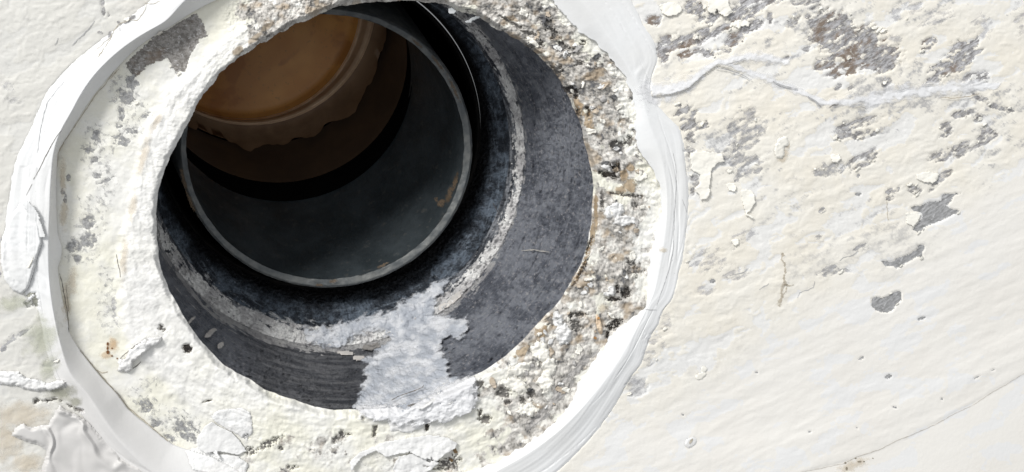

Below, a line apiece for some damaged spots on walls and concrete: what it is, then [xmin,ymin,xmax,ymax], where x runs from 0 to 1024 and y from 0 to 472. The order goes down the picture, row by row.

peeling [645,0,901,91]
peeling [84,14,207,184]
crack [636,53,1001,108]
water stain [616,164,635,194]
peeling [674,102,764,218]
peeling [814,115,879,178]
peeling [881,35,1014,269]
peeling [816,265,848,277]
peeling [871,291,902,312]
water stain [514,325,547,358]